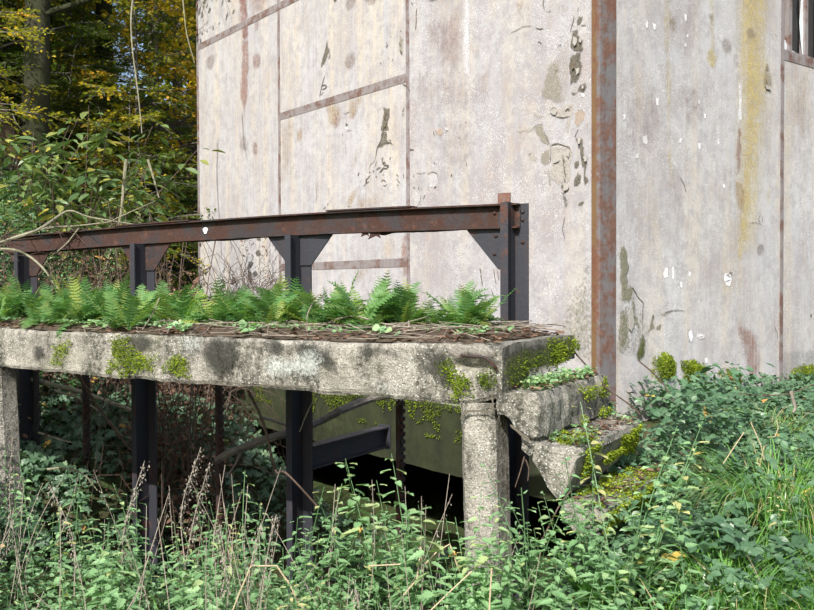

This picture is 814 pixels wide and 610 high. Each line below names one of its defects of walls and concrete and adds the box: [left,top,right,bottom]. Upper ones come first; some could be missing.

corrosion [240,0,248,104]
flaking render [358,108,393,186]
flaking render [517,63,588,206]
flaking render [569,17,586,97]
damp [738,0,766,177]